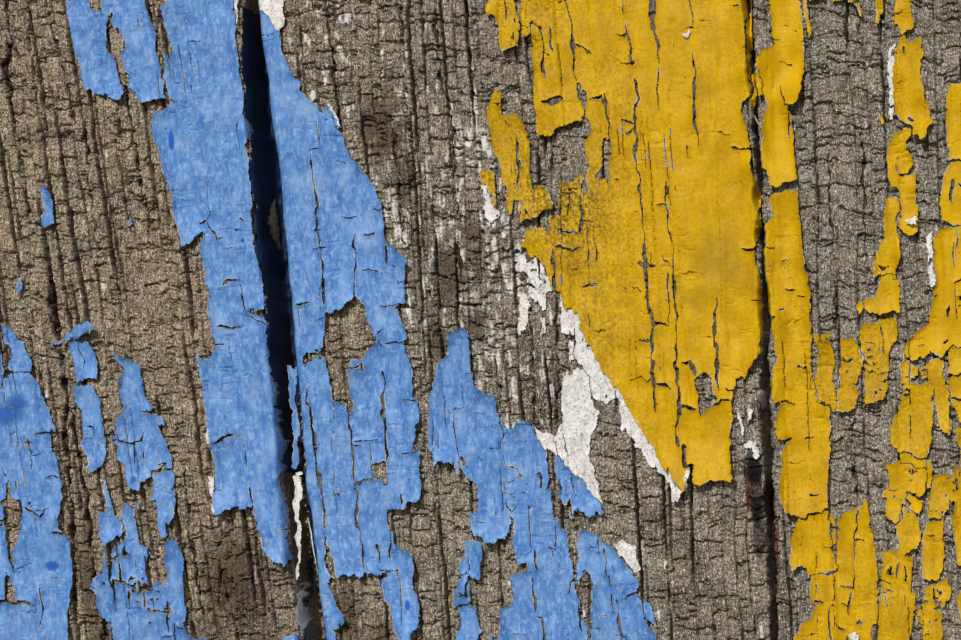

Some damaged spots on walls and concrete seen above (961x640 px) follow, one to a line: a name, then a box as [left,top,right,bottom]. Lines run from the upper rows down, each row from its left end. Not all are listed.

peeling [0,325,73,640]
peeling [51,0,657,640]
peeling [479,0,961,640]